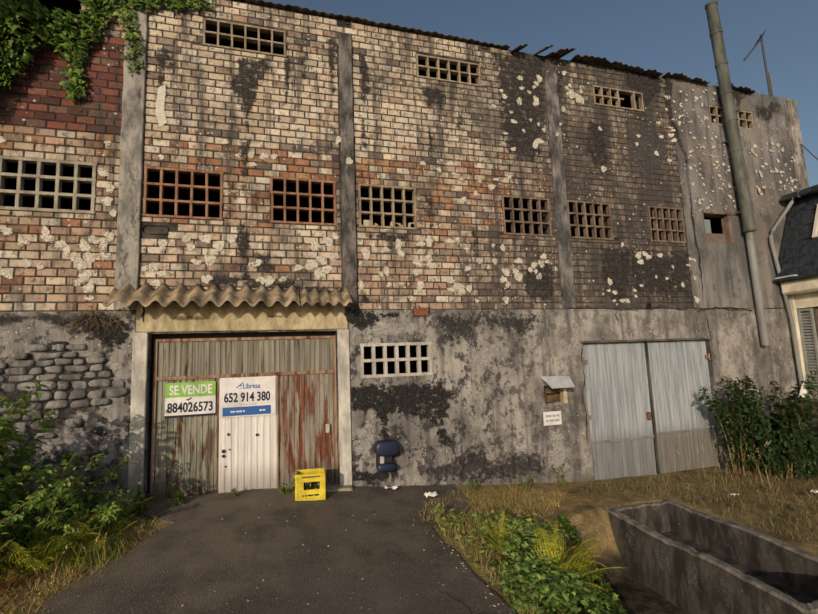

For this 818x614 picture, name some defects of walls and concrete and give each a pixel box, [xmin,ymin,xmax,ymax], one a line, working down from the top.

damp [326,37,338,91]
damp [229,58,269,189]
damp [492,51,545,172]
damp [585,122,608,168]
damp [0,311,133,352]
mould [430,311,543,340]
spalling [0,341,129,440]
mould [351,380,453,448]
mould [352,451,400,485]
damp [421,428,570,483]